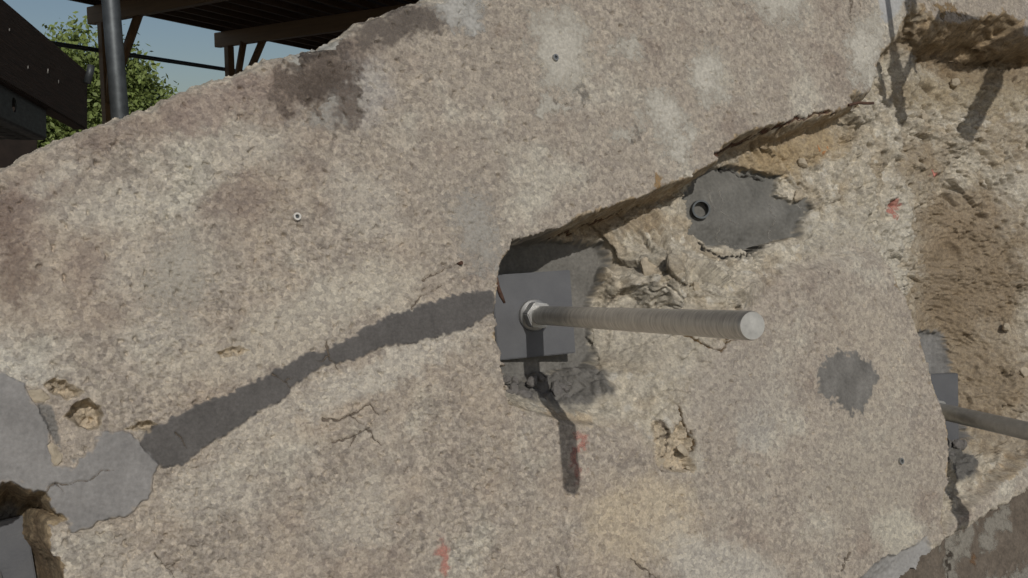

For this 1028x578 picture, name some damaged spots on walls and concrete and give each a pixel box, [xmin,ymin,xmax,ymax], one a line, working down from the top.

crack [714,111,835,181]
spalling [547,1,1028,421]
spalling [43,378,105,431]
spalling [124,420,158,432]
crack [321,404,380,446]
spalling [504,329,743,477]
spalling [0,482,66,578]
spalling [940,426,1028,539]